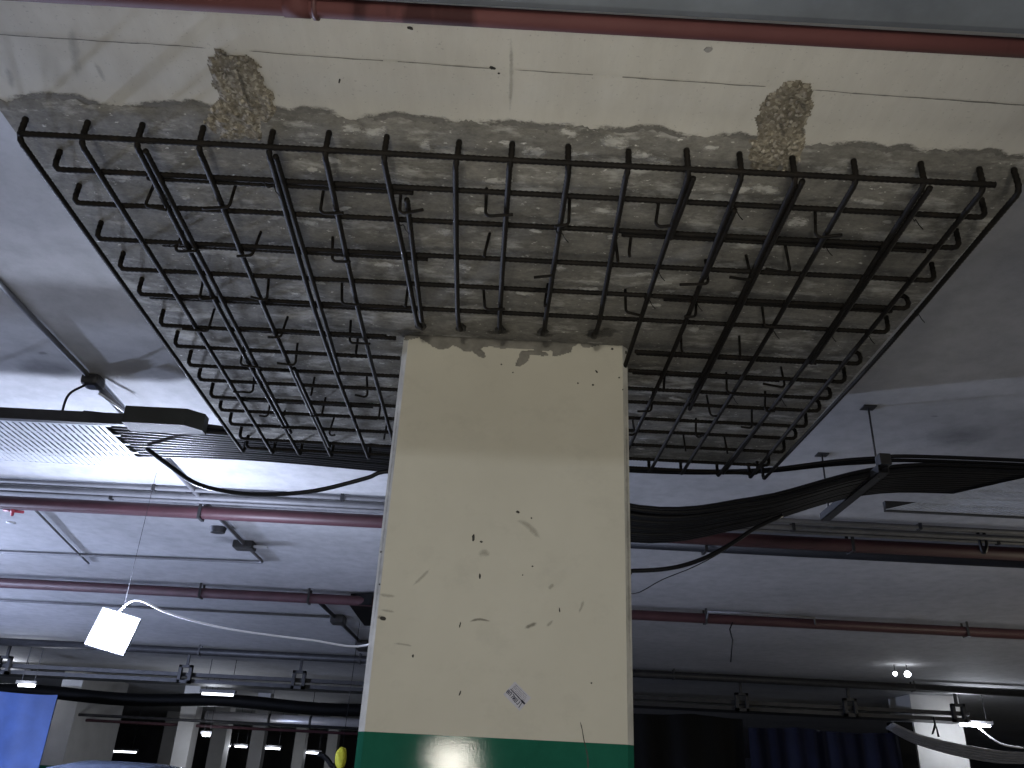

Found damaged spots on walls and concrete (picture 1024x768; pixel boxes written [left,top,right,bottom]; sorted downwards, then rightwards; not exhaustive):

spalling [0,93,1024,480]